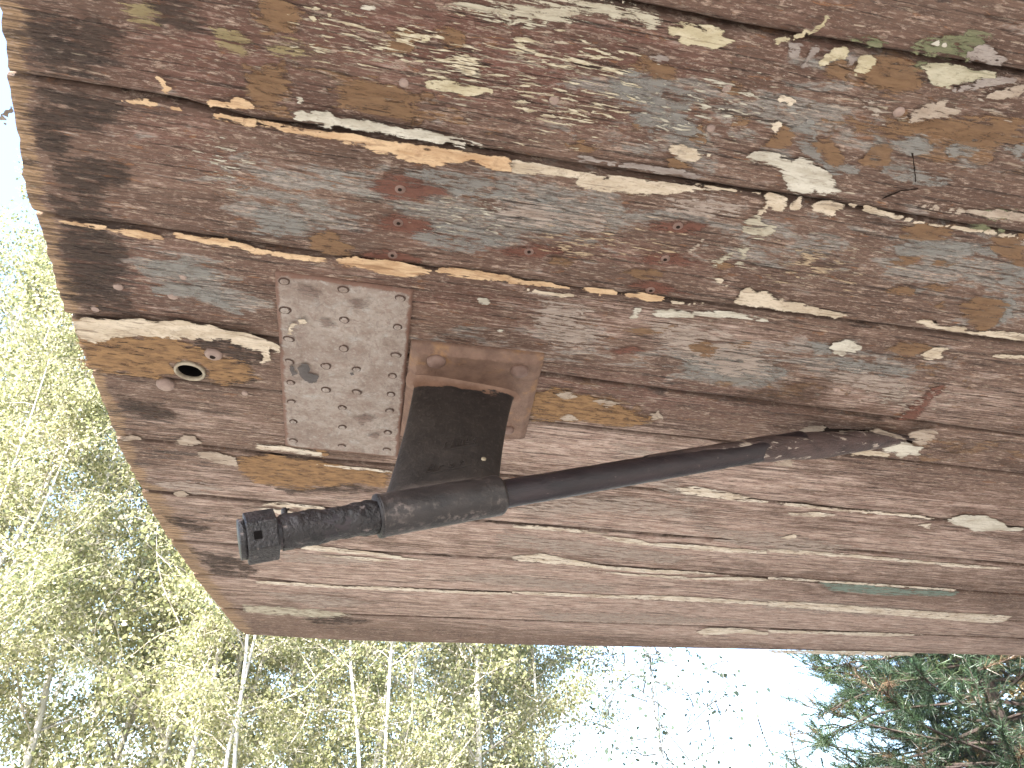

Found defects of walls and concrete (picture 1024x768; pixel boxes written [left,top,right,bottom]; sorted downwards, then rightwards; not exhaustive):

peeling [181,0,1024,269]
peeling [59,220,862,335]
peeling [885,284,1024,341]
peeling [70,305,280,386]
peeling [829,340,862,356]
peeling [175,435,392,491]
peeling [840,429,939,458]
peeling [259,502,325,514]
peeling [674,486,1023,532]
peeling [512,524,1004,569]
peeling [512,553,955,591]
peeling [243,581,1011,623]